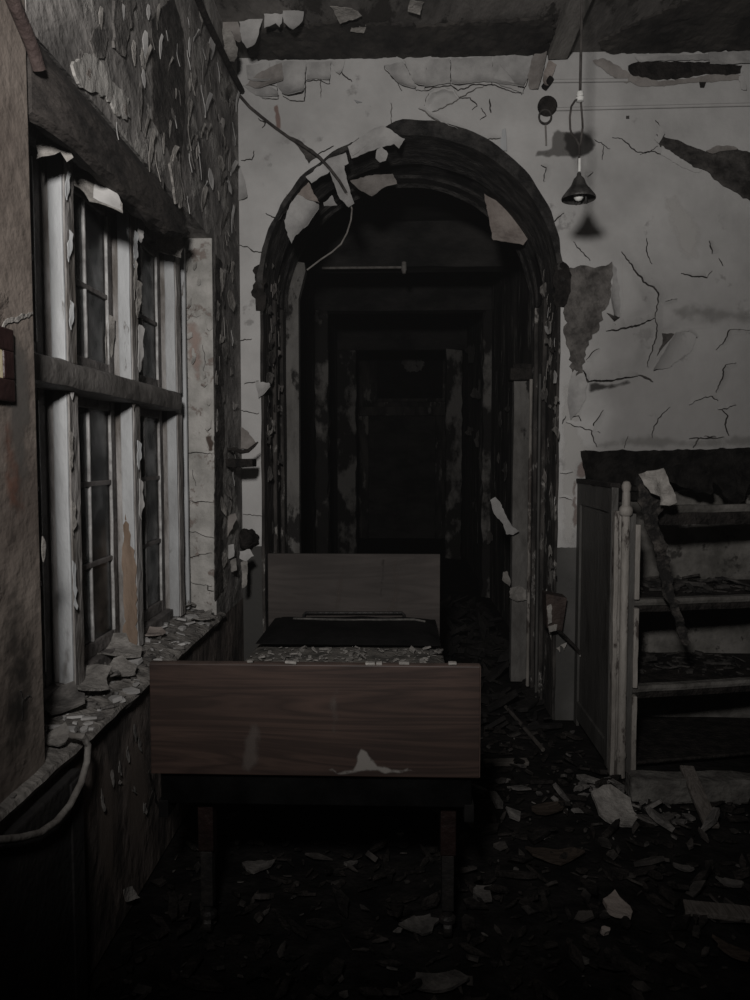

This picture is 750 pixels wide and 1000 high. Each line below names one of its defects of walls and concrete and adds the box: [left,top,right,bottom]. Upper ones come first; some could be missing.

flaking render [593,0,750,90]
crack [586,120,674,177]
spalling [654,122,750,201]
crack [553,210,564,222]
flaking render [70,0,556,616]
crack [583,238,723,383]
spalling [540,262,620,456]
crack [624,329,750,448]
crack [189,528,214,592]